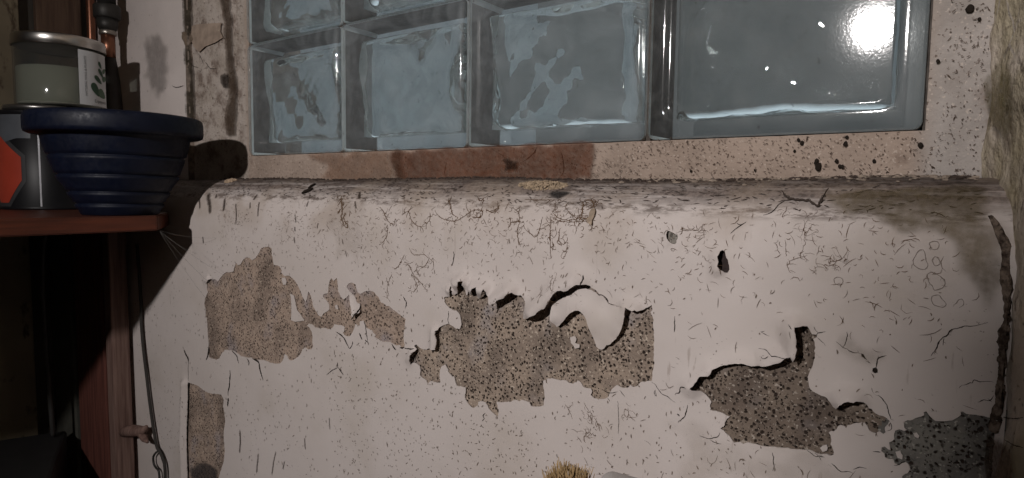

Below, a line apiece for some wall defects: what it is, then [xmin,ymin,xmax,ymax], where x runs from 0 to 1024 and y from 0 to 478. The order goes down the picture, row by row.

peeling [188,383,225,478]
peeling [205,247,654,416]
peeling [690,326,1007,478]
crack [931,215,1023,448]